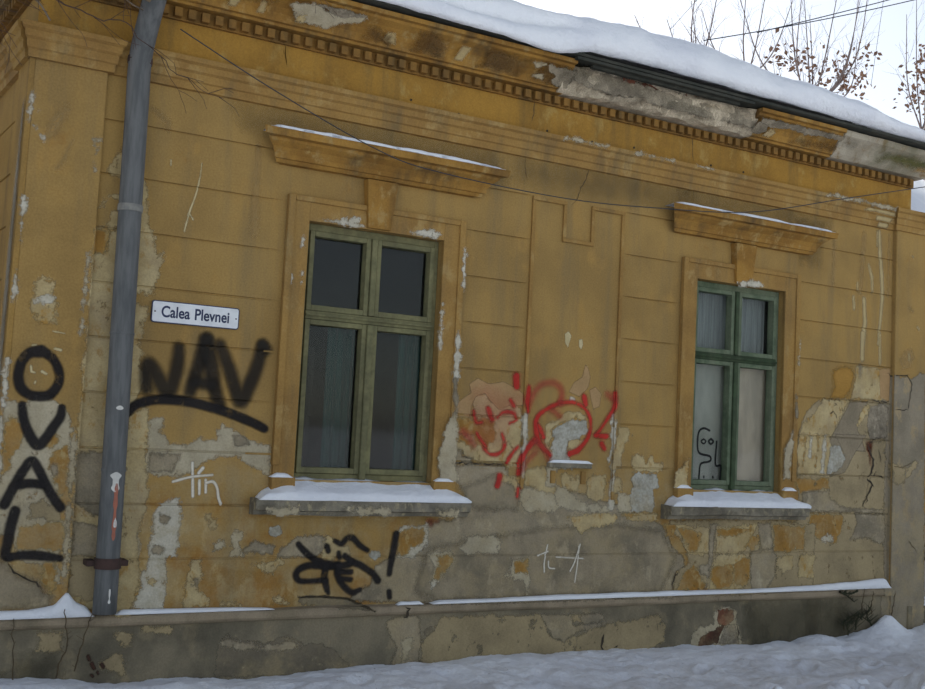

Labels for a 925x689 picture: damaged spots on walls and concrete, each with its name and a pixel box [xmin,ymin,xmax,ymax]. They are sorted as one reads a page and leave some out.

flaking render [290,2,367,29]
flaking render [533,61,845,142]
peeling [326,216,365,228]
peeling [410,229,442,239]
peeling [737,280,763,288]
peeling [0,194,119,611]
peeling [113,180,271,617]
flaking render [346,332,925,665]
flaking render [212,504,350,574]
flaking render [35,631,63,653]
flaking render [99,625,173,677]
peeling [220,636,299,652]